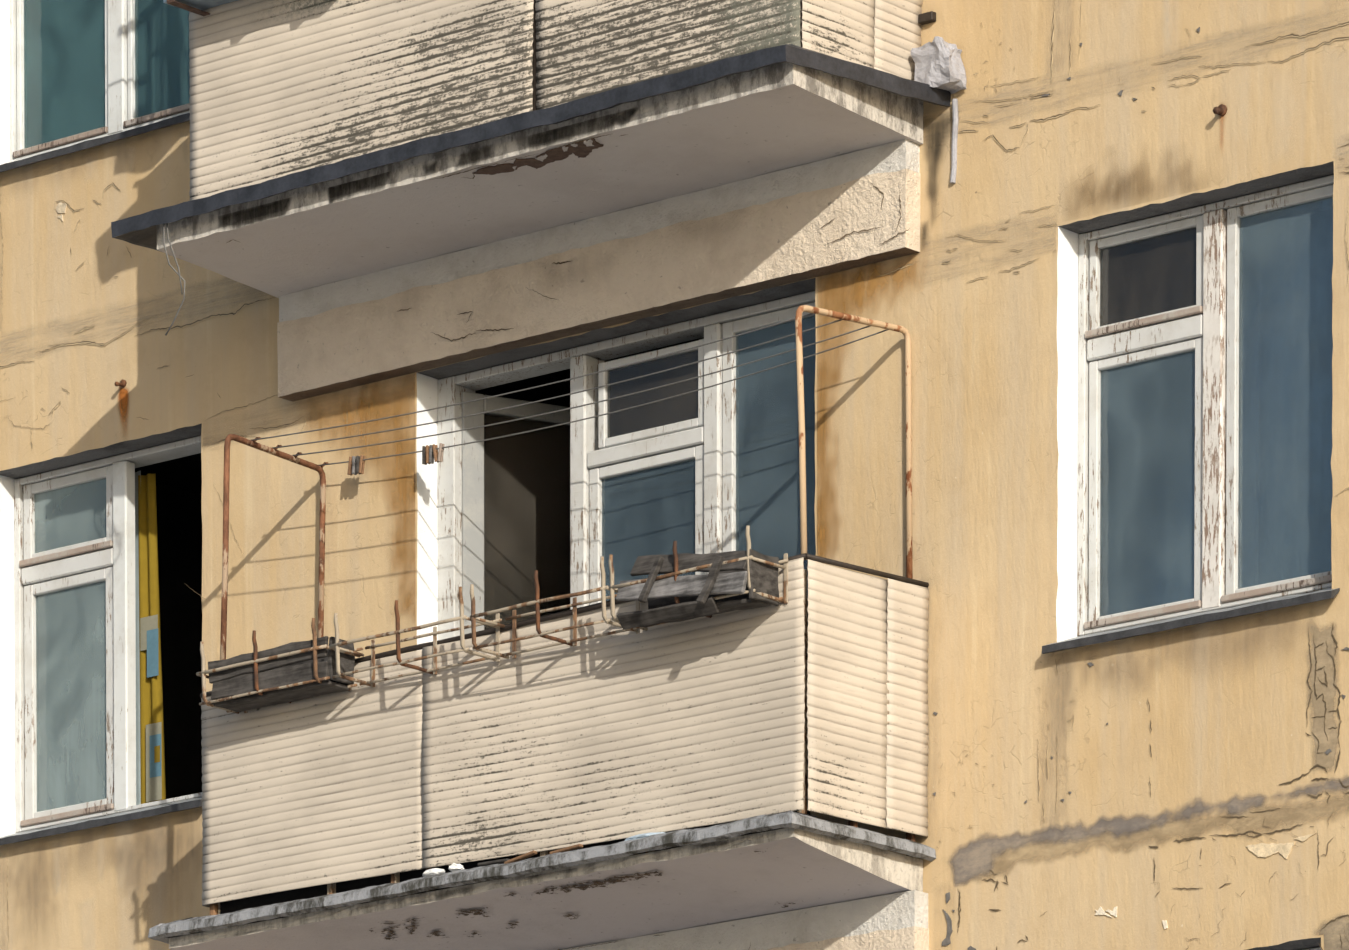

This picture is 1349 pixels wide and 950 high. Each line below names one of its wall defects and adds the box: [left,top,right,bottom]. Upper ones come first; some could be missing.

crack [960,0,1349,151]
leakage [527,109,636,146]
leakage [458,147,490,165]
peeling [472,138,604,175]
leakage [328,172,389,202]
rust [119,388,128,421]
leakage [319,397,408,525]
peeling [1247,833,1316,859]